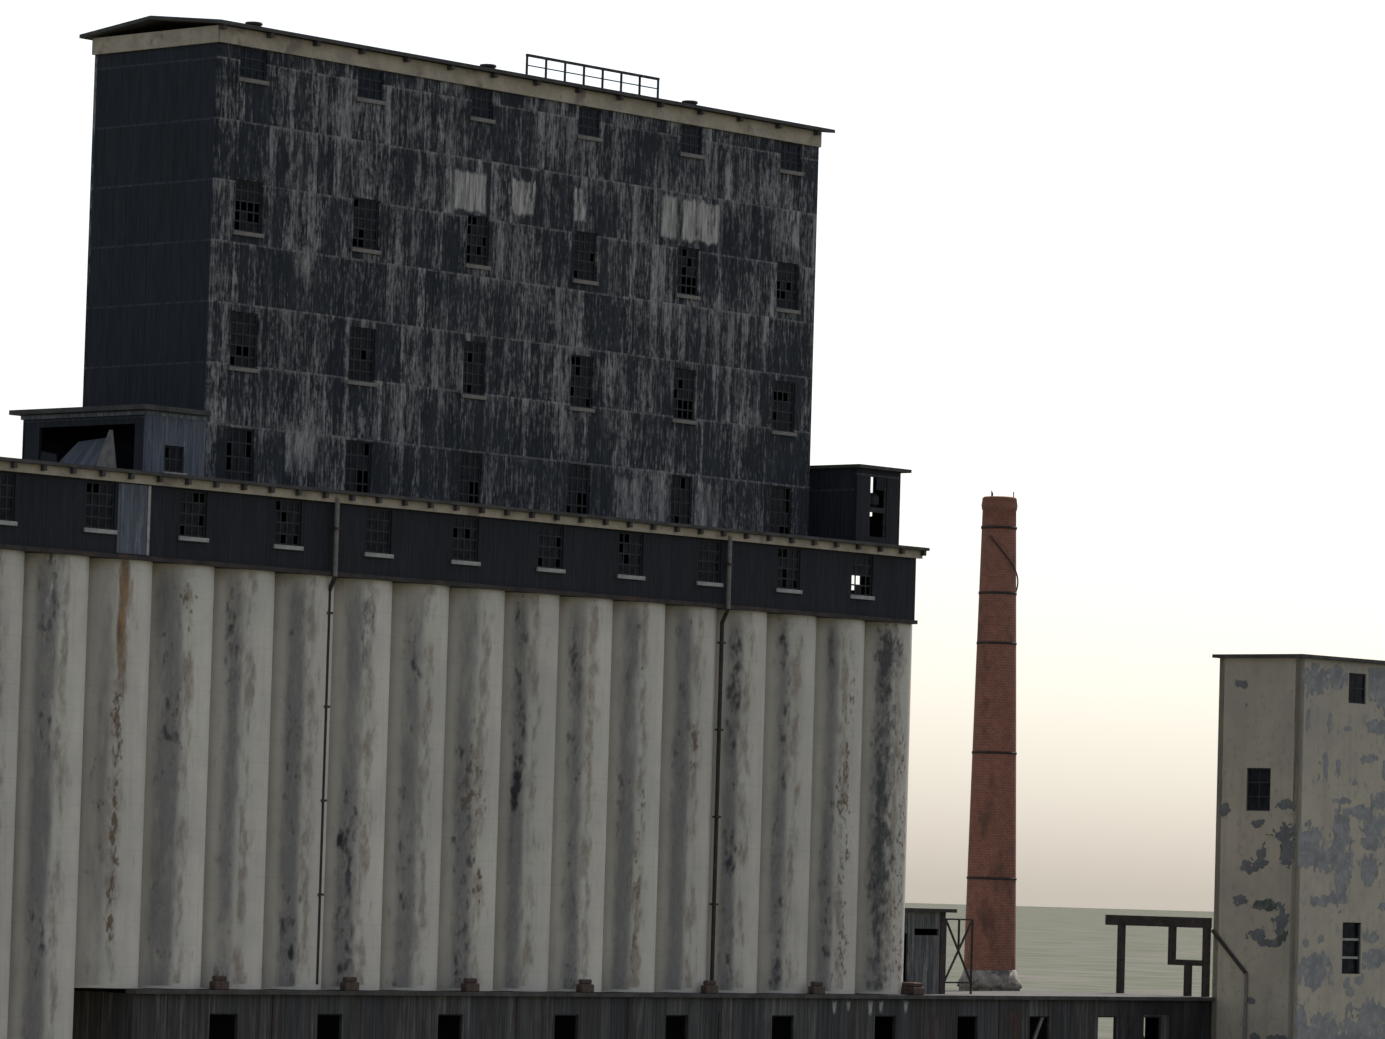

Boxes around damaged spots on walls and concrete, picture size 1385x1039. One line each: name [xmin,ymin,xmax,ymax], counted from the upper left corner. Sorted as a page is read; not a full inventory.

rust [118,560,128,668]
water stain [151,583,190,986]
water stain [336,744,368,973]
water stain [507,674,536,988]
water stain [721,664,740,990]
water stain [869,632,902,1013]
peeling [1219,801,1231,817]
peeling [1233,894,1385,1039]
peeling [1240,752,1385,914]
peeling [1327,667,1385,738]